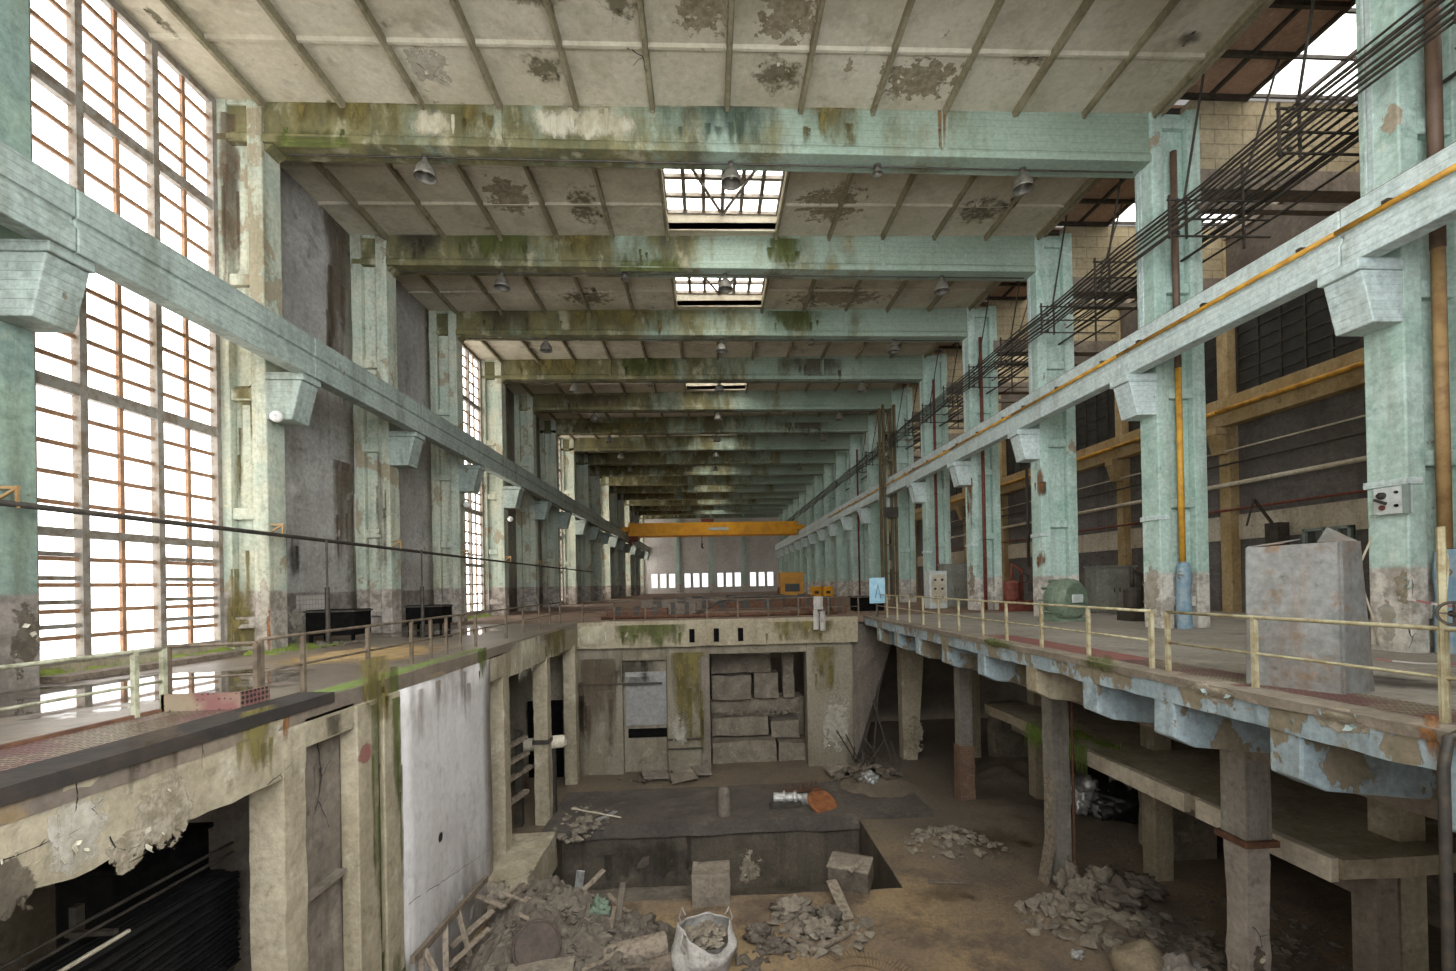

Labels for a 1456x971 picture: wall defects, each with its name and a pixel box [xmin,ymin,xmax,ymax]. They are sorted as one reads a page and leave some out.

peeling [673,0,736,38]
peeling [754,0,820,93]
peeling [877,56,972,101]
damp [415,103,492,134]
damp [535,107,634,140]
damp [687,105,760,138]
damp [803,112,826,136]
peeling [482,174,540,217]
peeling [795,183,869,223]
spalling [47,771,194,876]
damp [372,745,404,923]
spalling [0,851,37,921]